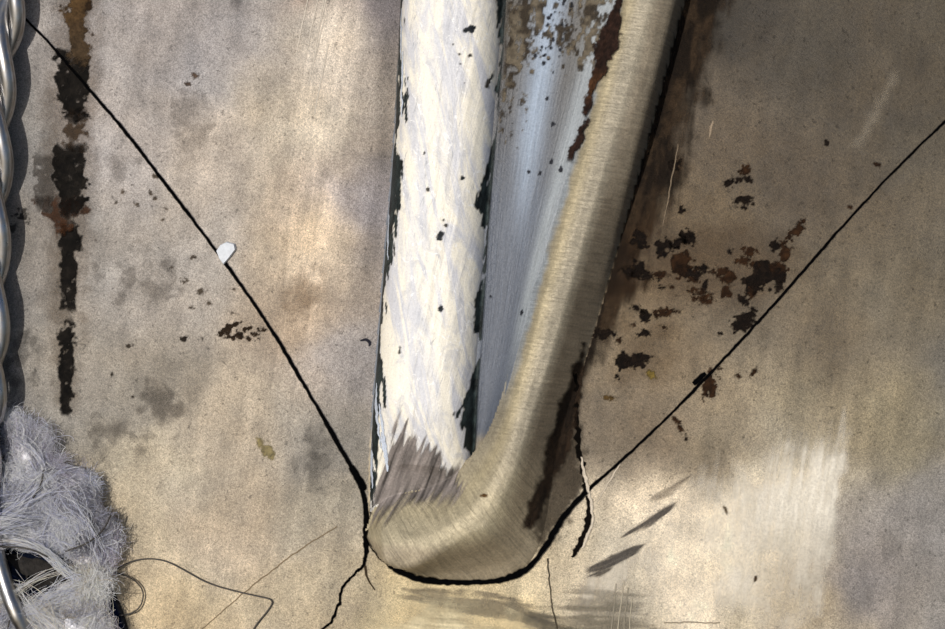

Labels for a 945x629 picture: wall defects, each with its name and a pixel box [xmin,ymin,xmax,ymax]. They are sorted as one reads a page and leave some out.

rust [31,0,94,415]
crack [26,18,218,255]
peeling [369,0,462,522]
peeling [453,358,480,455]
peeling [474,137,496,340]
peeling [485,0,506,107]
crack [224,120,945,629]
rust [524,0,806,544]